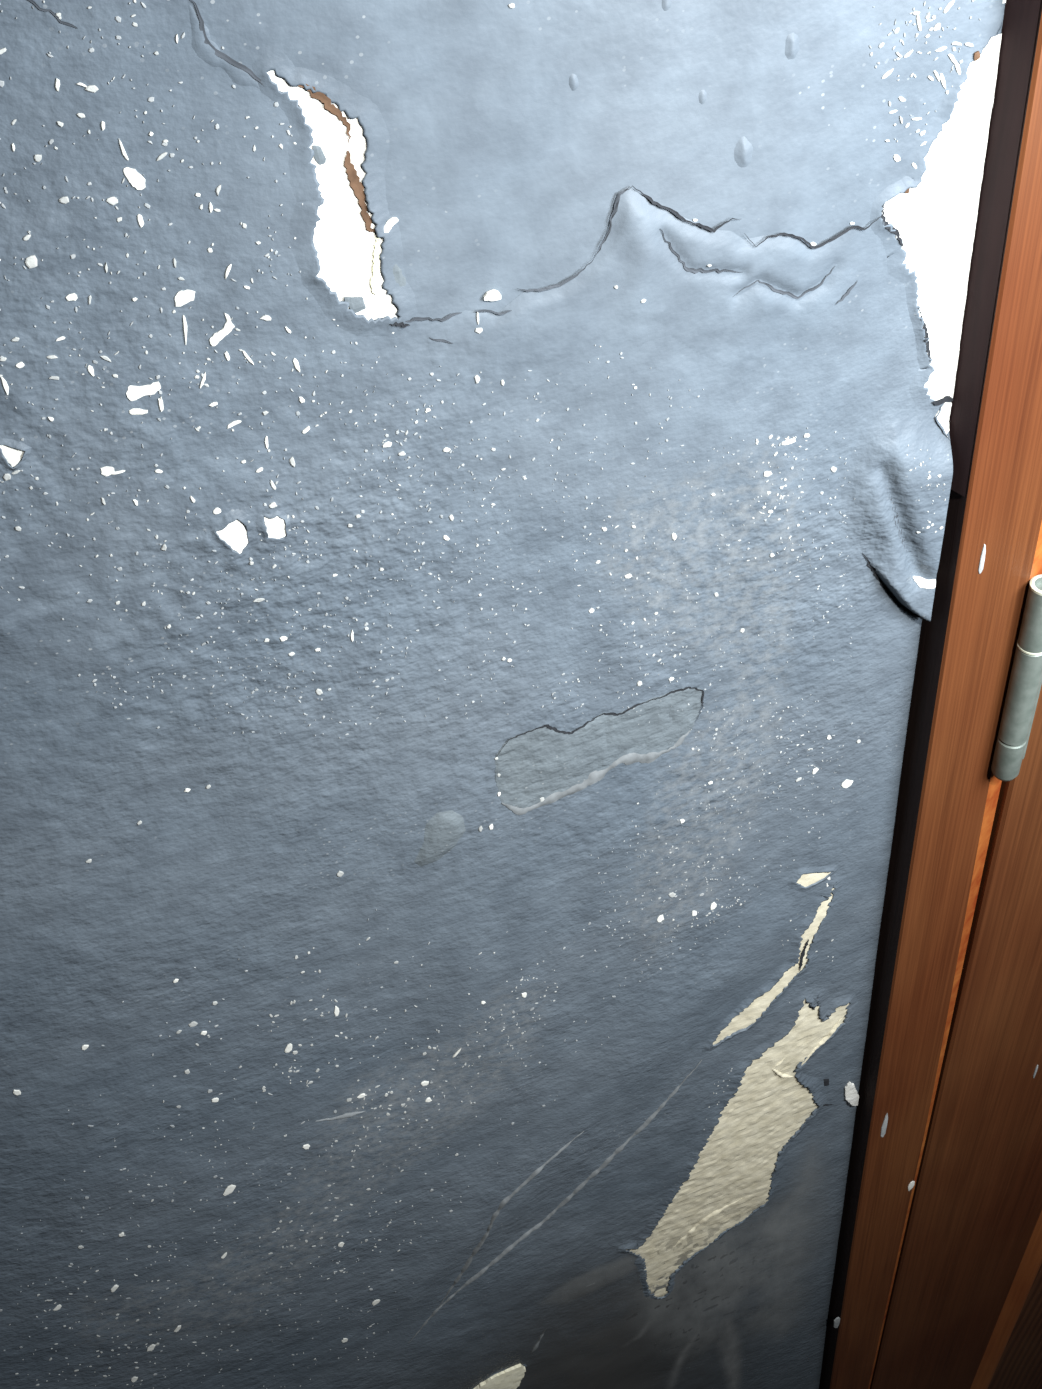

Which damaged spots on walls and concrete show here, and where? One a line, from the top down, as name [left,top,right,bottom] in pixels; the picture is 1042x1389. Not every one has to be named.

crack [29,0,78,29]
peeling [32,0,159,58]
crack [188,0,265,89]
crack [406,186,881,344]
spalling [869,0,1006,439]
peeling [906,444,946,534]
spalling [0,44,861,1300]
peeling [212,960,558,1389]
peeling [0,1246,252,1389]